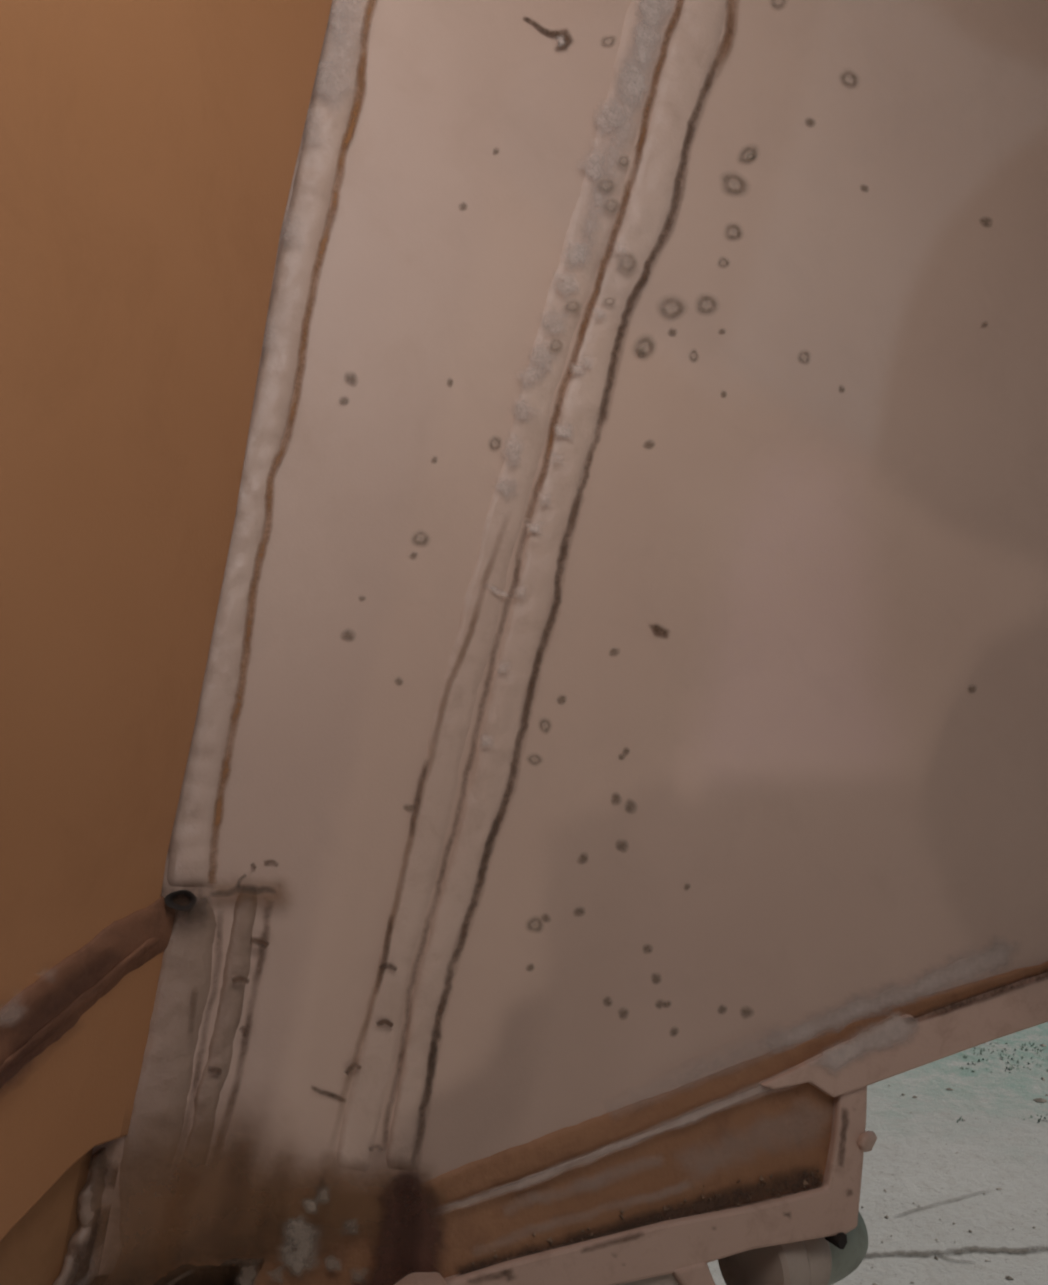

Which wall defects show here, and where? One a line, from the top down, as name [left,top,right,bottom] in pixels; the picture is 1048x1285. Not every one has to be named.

crack [454,59,717,957]
crack [420,989,448,1134]